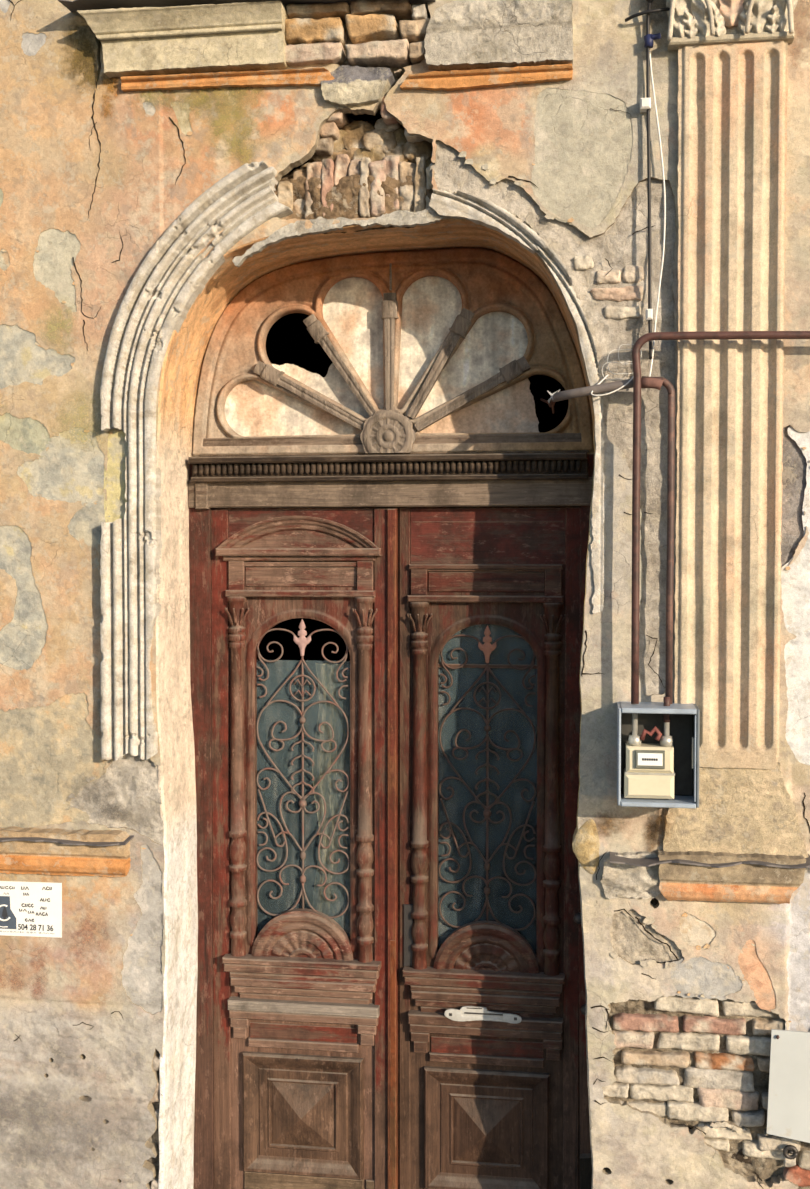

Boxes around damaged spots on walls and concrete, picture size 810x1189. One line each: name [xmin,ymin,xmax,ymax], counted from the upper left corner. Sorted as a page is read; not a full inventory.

spalling [285,0,431,84]
crack [88,93,101,215]
crack [169,117,186,184]
peeling [33,229,81,312]
peeling [0,324,75,389]
flaking render [274,88,676,695]
peeling [0,413,128,568]
peeling [0,525,48,670]
peeling [781,425,810,765]
spalling [602,867,810,1189]